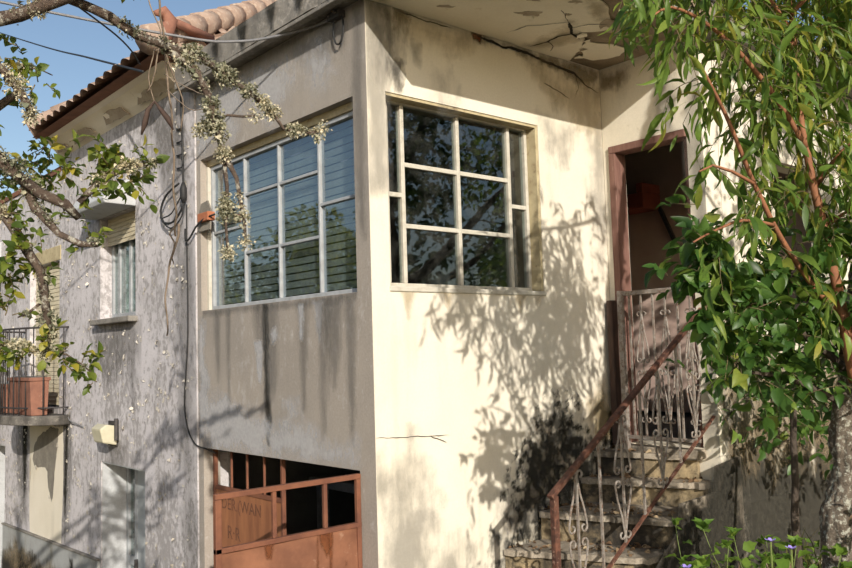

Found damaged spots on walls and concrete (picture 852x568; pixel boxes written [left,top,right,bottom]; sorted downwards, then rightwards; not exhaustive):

crack [398,10,450,28]
crack [472,11,605,98]
peeling [95,325,150,404]
damp [198,304,334,457]
crack [380,434,445,442]
peeling [1,413,99,543]
damp [1,541,50,568]